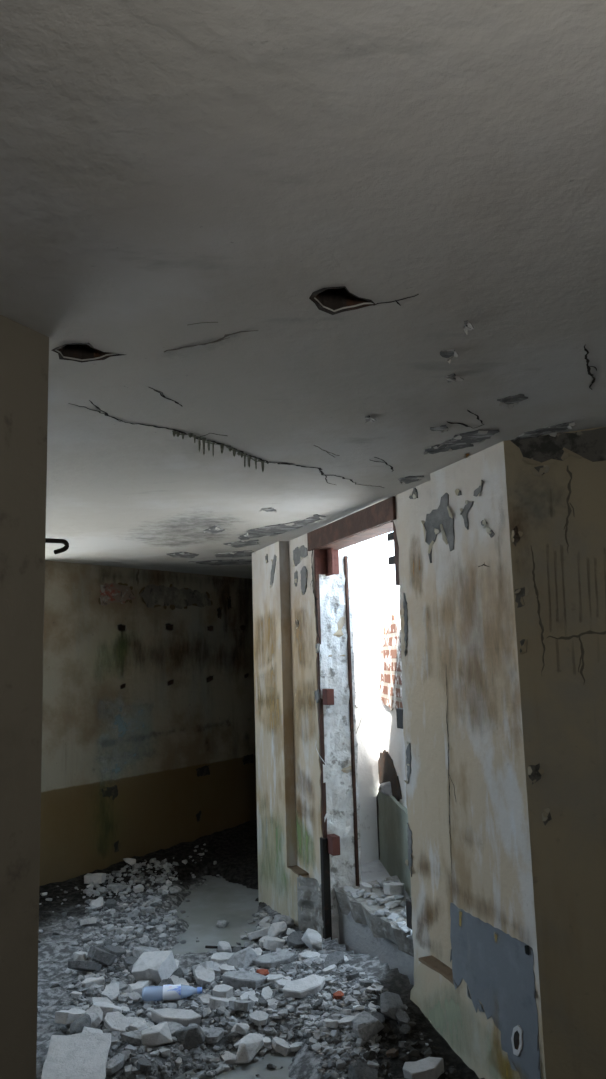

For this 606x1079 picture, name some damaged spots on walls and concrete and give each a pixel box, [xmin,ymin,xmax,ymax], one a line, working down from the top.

crack [164,322,258,352]
crack [68,387,394,488]
peeling [167,508,327,595]
peeling [399,476,424,499]
peeling [421,480,495,563]
peeling [423,425,499,455]
peeling [511,525,523,546]
peeling [510,421,606,477]
crack [563,466,574,551]
crack [531,547,606,683]
leakage [134,589,280,730]
peeling [450,903,541,1079]